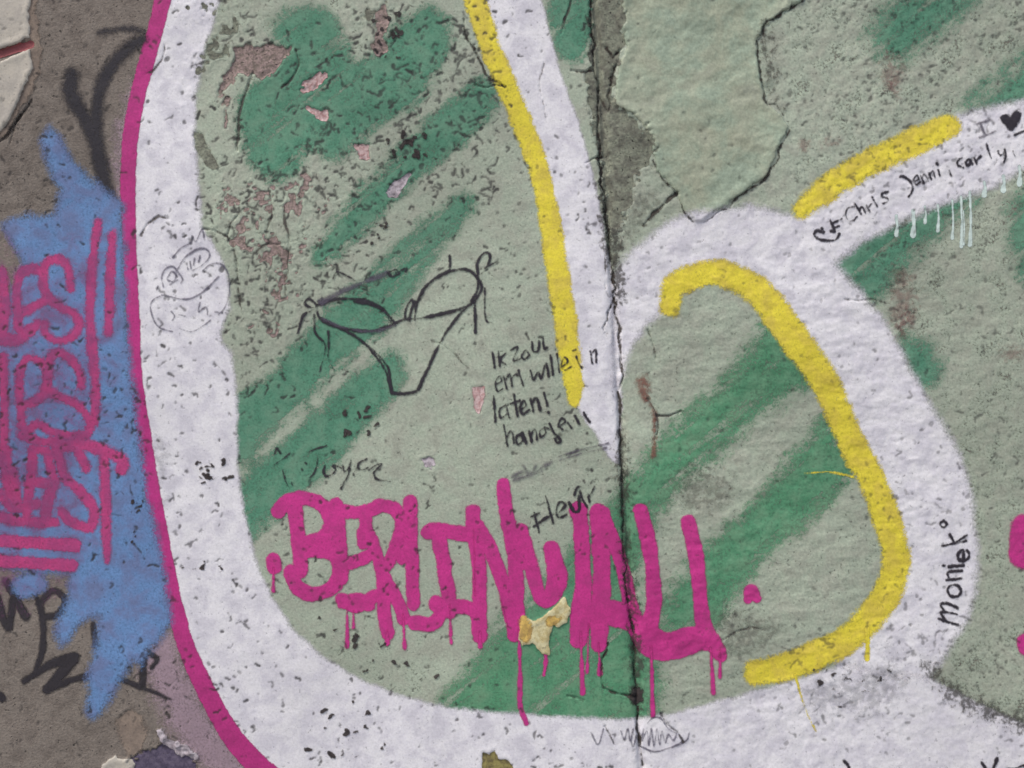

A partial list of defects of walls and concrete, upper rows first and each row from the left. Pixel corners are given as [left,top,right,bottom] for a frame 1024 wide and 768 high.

peeling [194,131,218,169]
peeling [185,0,292,129]
peeling [300,72,328,93]
peeling [306,106,329,121]
crack [643,0,803,227]
peeling [216,172,330,302]
crack [563,0,684,766]